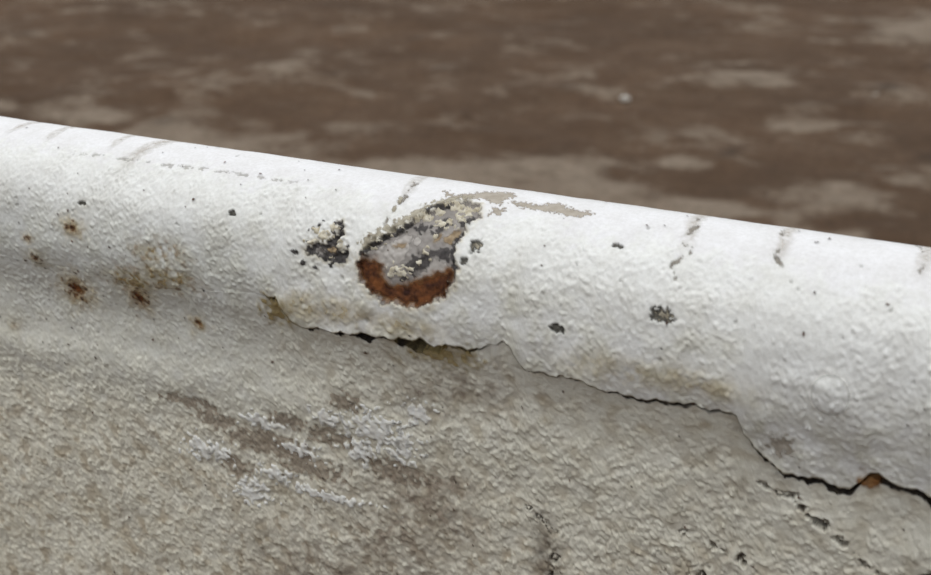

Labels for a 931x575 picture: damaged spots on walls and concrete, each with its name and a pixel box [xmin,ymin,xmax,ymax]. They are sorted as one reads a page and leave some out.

corrosion [116,269,183,304]
crack [259,297,485,367]
spalling [290,191,596,308]
crack [509,347,931,541]